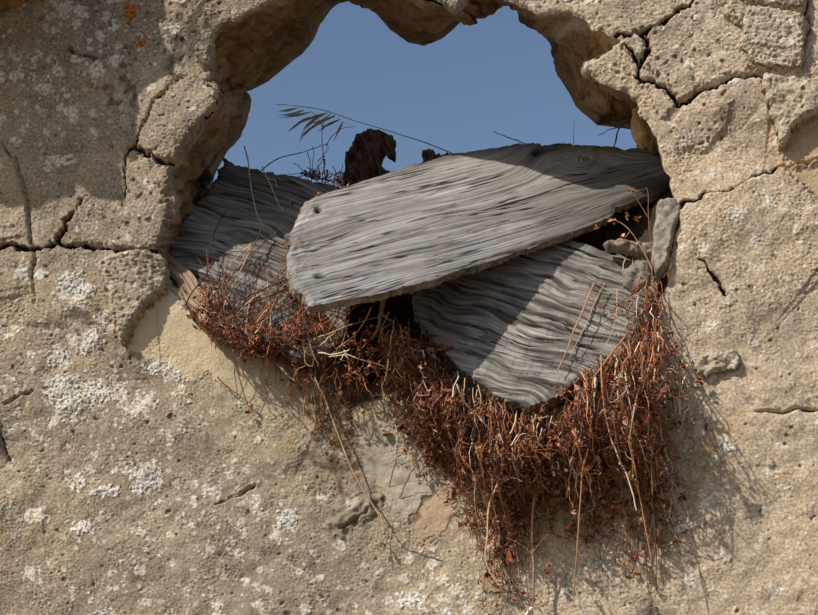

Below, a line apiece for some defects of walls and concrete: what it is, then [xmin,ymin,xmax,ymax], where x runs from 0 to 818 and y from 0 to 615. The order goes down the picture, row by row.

crack [614,0,763,109]
crack [802,0,810,67]
crack [124,78,184,198]
crack [680,168,777,209]
crack [0,145,127,304]
crack [698,259,727,297]
crack [754,407,818,415]